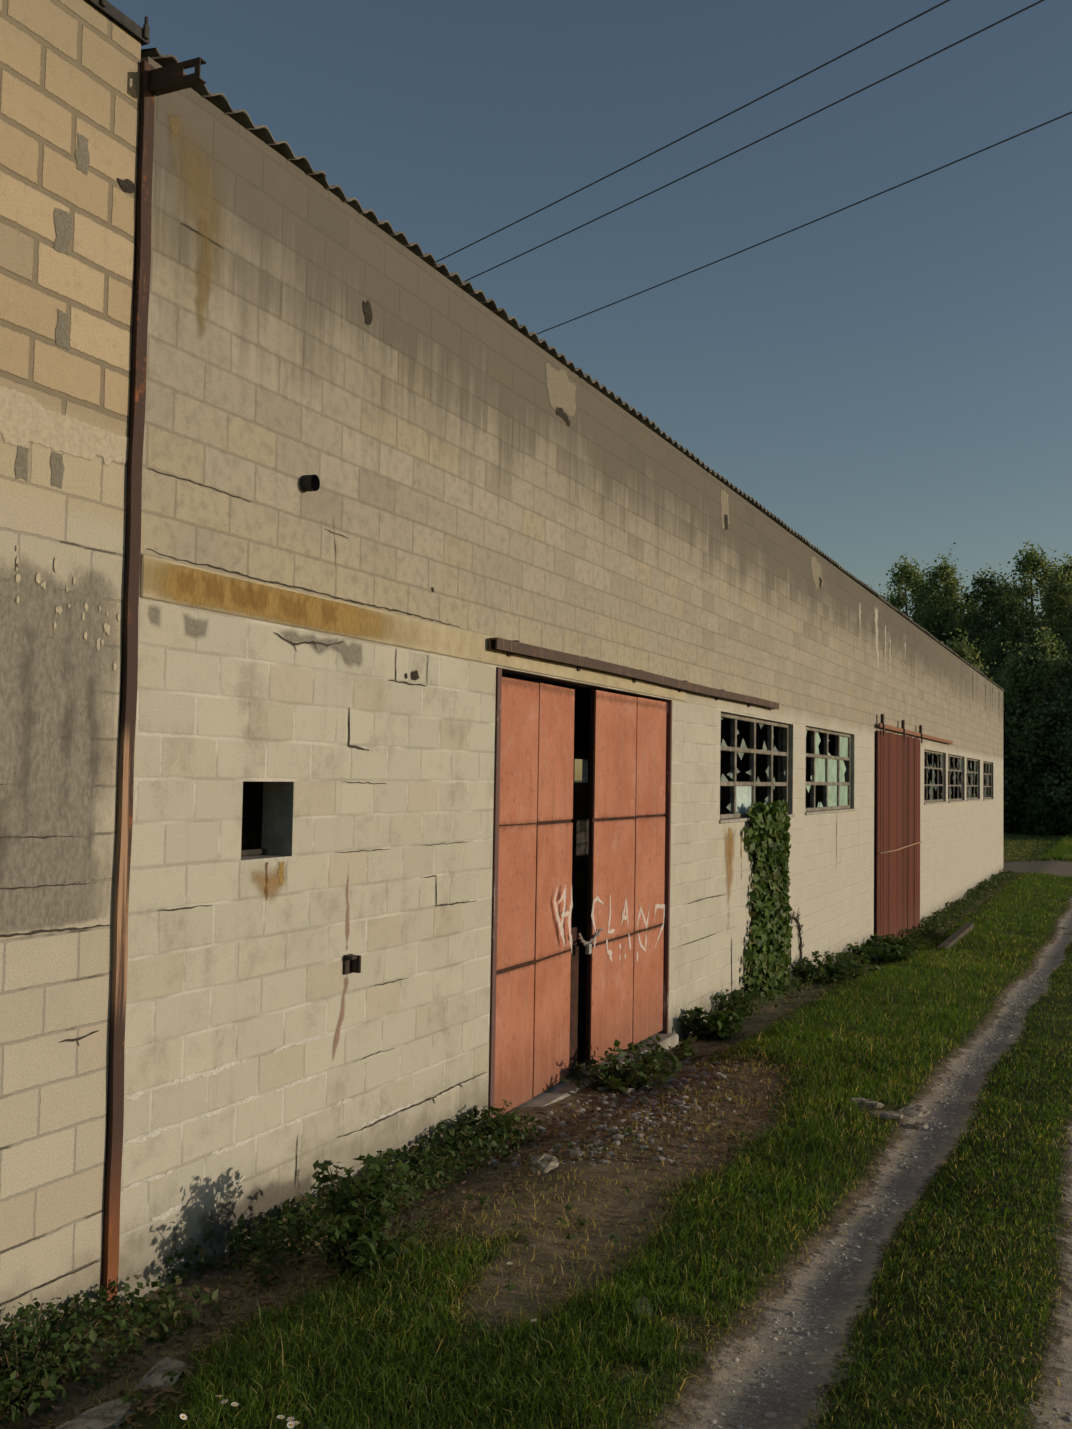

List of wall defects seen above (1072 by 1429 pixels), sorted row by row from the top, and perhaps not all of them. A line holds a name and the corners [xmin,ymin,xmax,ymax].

flaking render [0,385,129,466]
spalling [546,362,576,426]
corrosion [154,564,386,638]
spalling [285,632,362,665]
leakage [0,564,116,933]
corrosion [254,862,285,900]
corrosion [726,829,742,888]
corrosion [334,979,348,1055]